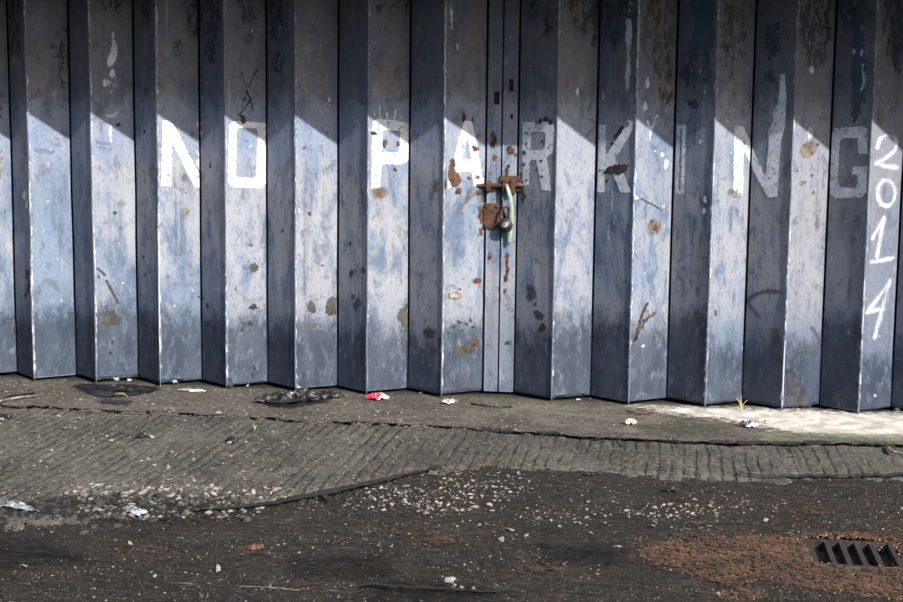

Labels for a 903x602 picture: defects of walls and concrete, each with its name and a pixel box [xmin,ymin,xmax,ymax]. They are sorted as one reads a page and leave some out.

rust [430,159,490,236]
rust [504,143,528,203]
peeling [599,163,629,183]
peeling [102,310,122,326]
damp [0,268,483,394]
peeling [296,280,337,338]
peeling [397,304,408,331]
peeling [423,326,441,355]
peeling [447,319,479,354]
peeling [526,284,555,349]
damp [514,302,903,411]